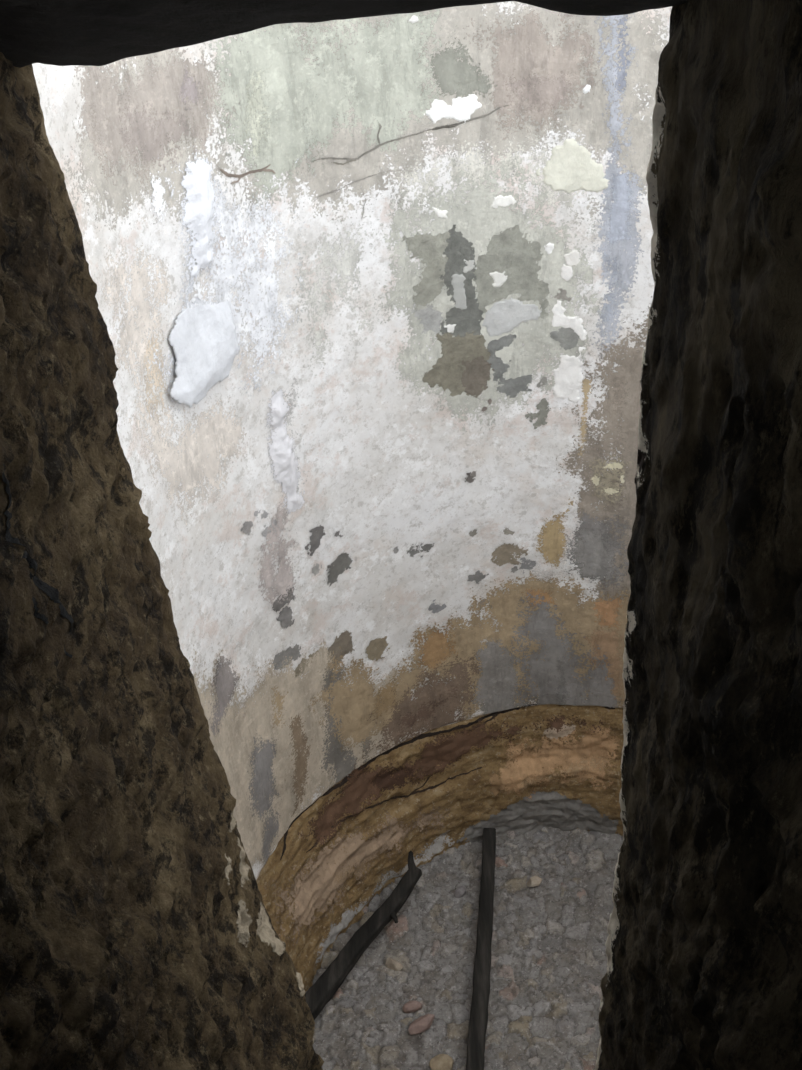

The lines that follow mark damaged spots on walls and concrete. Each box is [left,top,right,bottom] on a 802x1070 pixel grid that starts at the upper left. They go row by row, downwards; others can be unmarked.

crack [220,164,275,184]
crack [313,105,509,219]
flaking render [492,195,517,209]
flaking render [168,278,240,408]
flaking render [403,207,587,429]
damp [191,632,408,868]